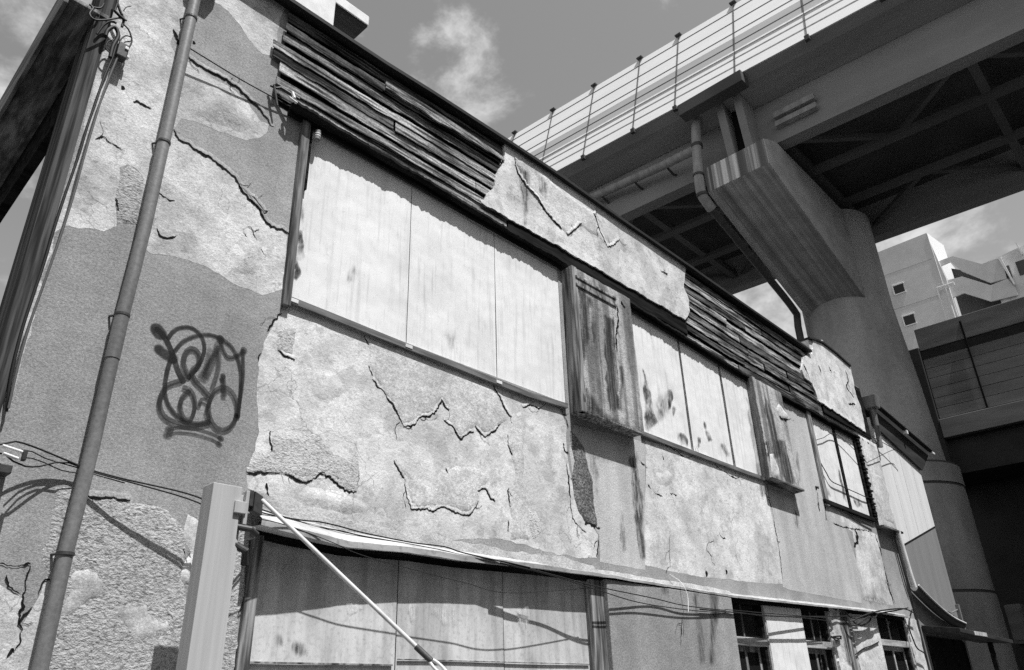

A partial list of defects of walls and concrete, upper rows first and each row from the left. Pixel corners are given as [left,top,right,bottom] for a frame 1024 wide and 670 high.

spalling [115,165,143,225]
crack [173,129,289,252]
crack [515,157,627,247]
crack [246,431,360,496]
crack [364,335,600,556]
spalling [570,431,597,526]
damp [643,374,675,427]
spalling [41,487,73,583]
crack [0,562,50,657]
spalling [49,497,198,670]